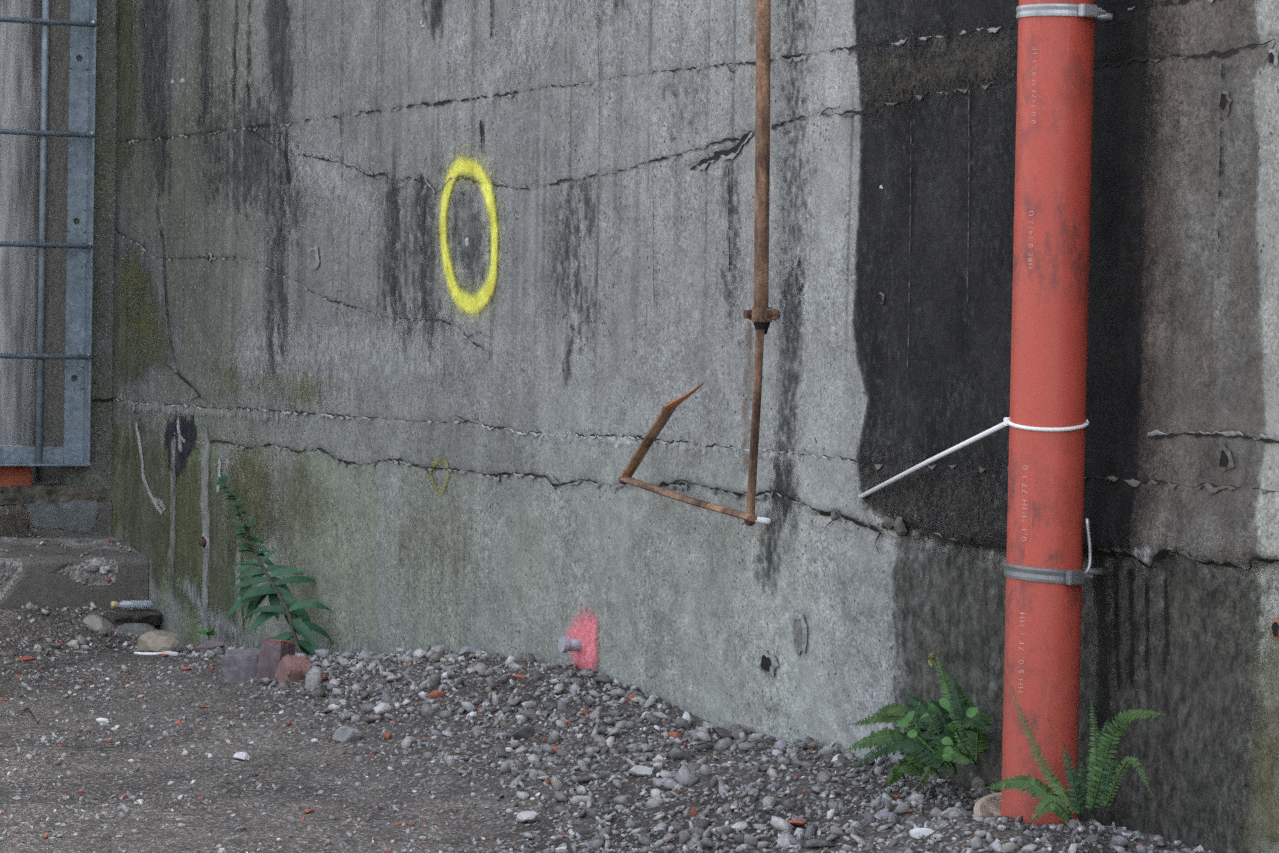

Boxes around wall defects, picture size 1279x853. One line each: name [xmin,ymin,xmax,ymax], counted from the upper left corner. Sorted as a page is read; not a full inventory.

water stain [422,0,445,39]
water stain [117,394,295,648]
water stain [376,161,490,358]
crack [92,208,1008,554]
water stain [853,0,1019,793]
water stain [1077,0,1273,853]
crack [1085,474,1276,495]
crack [1083,548,1279,571]